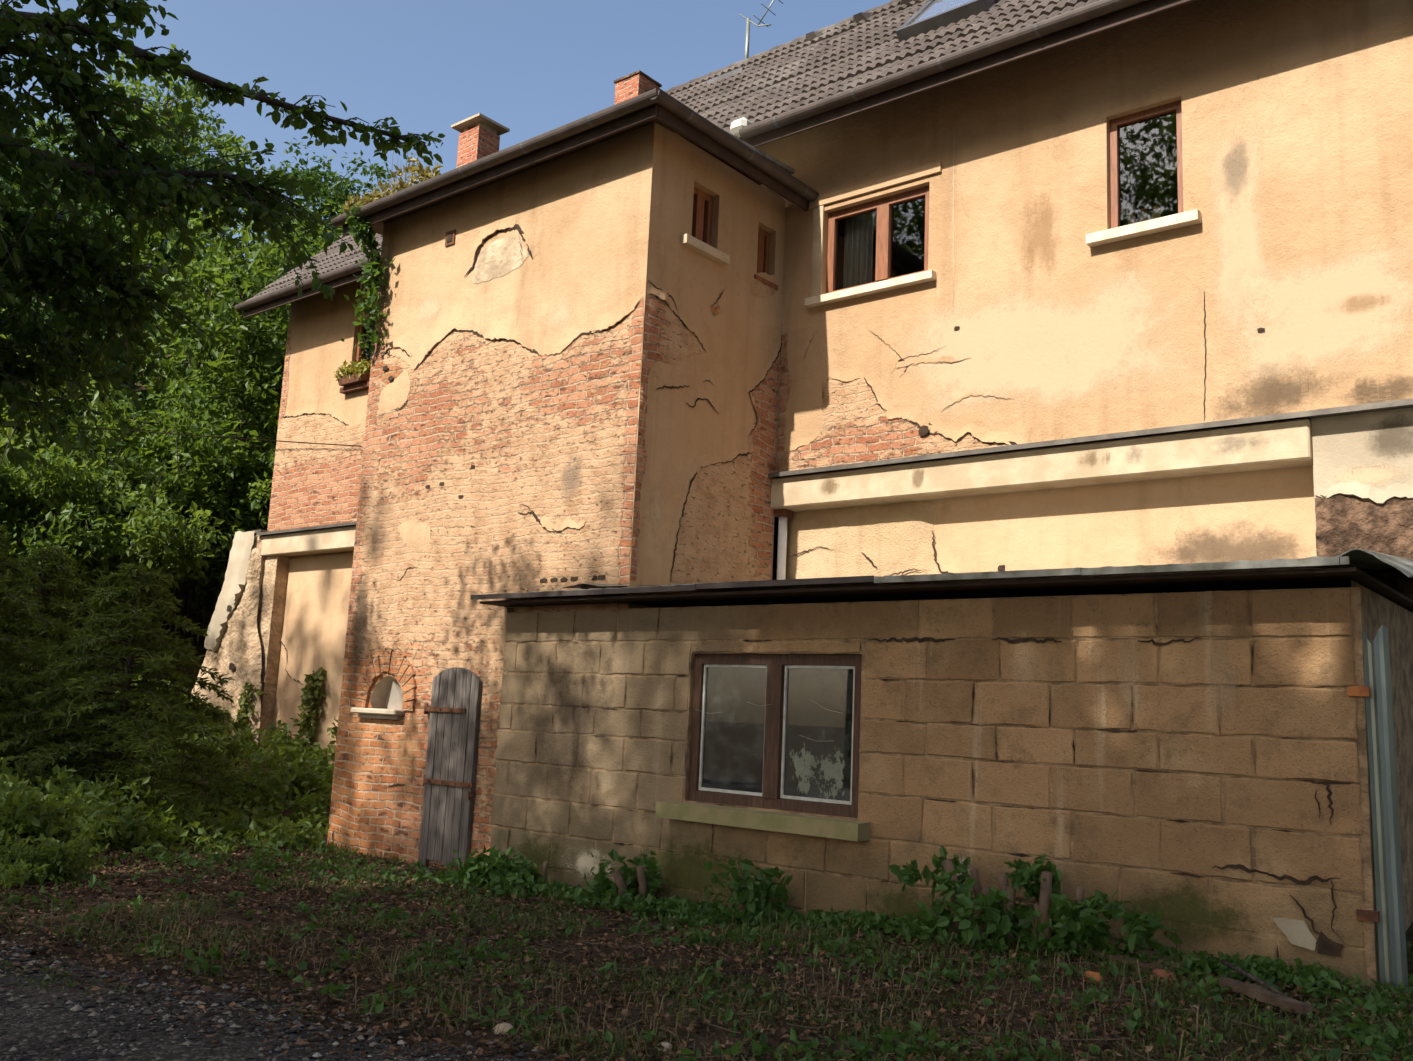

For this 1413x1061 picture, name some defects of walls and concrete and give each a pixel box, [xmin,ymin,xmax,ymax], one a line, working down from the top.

crack [949,124,957,296]
crack [868,330,1017,412]
spalling [204,248,725,870]
crack [518,504,587,533]
spalling [664,329,1029,593]
spalling [1314,480,1413,613]
crack [1311,782,1334,825]
crack [1212,864,1343,942]